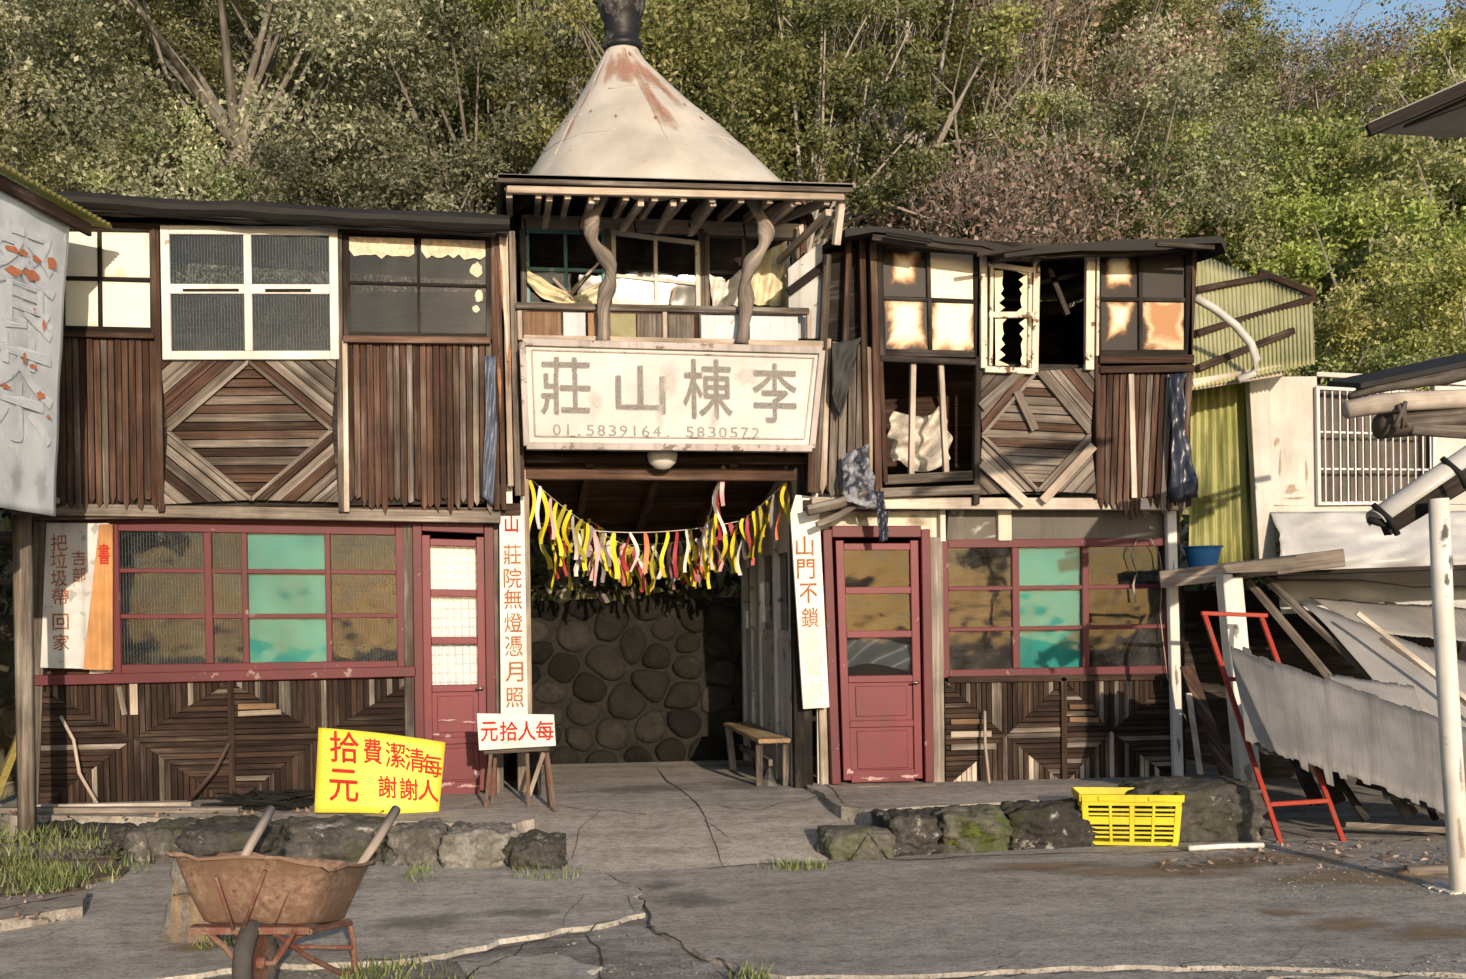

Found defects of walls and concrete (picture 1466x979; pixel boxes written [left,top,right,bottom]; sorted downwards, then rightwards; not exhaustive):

rust [558,51,703,132]
crack [558,769,1187,869]
crack [330,893,776,979]